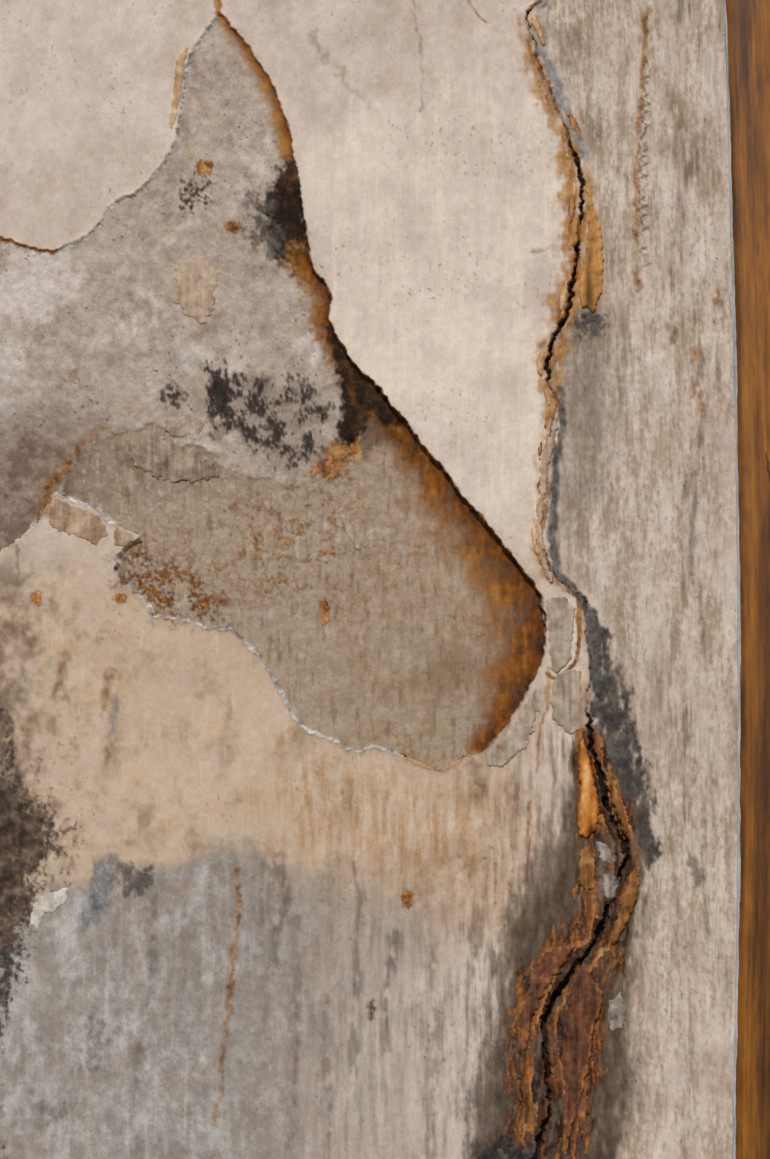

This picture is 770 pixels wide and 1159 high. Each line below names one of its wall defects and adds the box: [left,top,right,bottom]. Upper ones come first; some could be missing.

crack [214,0,222,13]
flaking render [0,15,519,772]
damp [204,326,404,470]
crack [487,0,630,877]
damp [0,708,304,1159]
crack [522,802,530,899]
damp [466,609,662,1159]
crack [534,904,609,1159]